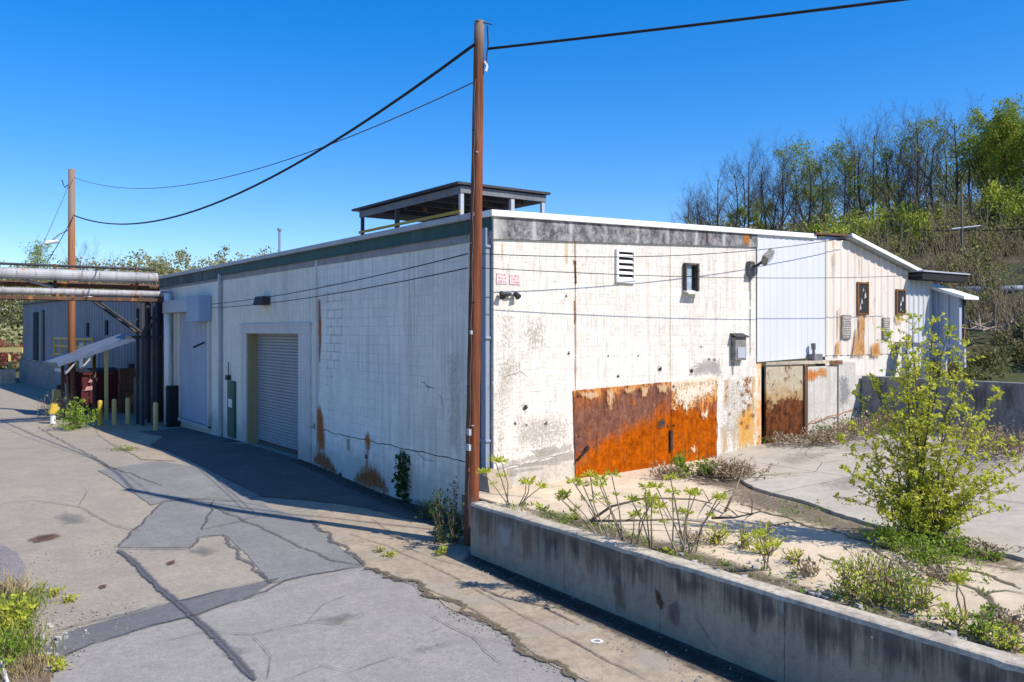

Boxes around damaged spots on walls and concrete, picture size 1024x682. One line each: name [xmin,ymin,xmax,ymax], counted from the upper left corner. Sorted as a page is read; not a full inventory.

rust [808,310,880,382]
rust [314,406,335,473]
rust [354,434,386,494]
crack [311,427,464,462]
peeling [580,366,752,452]
crack [117,550,257,680]